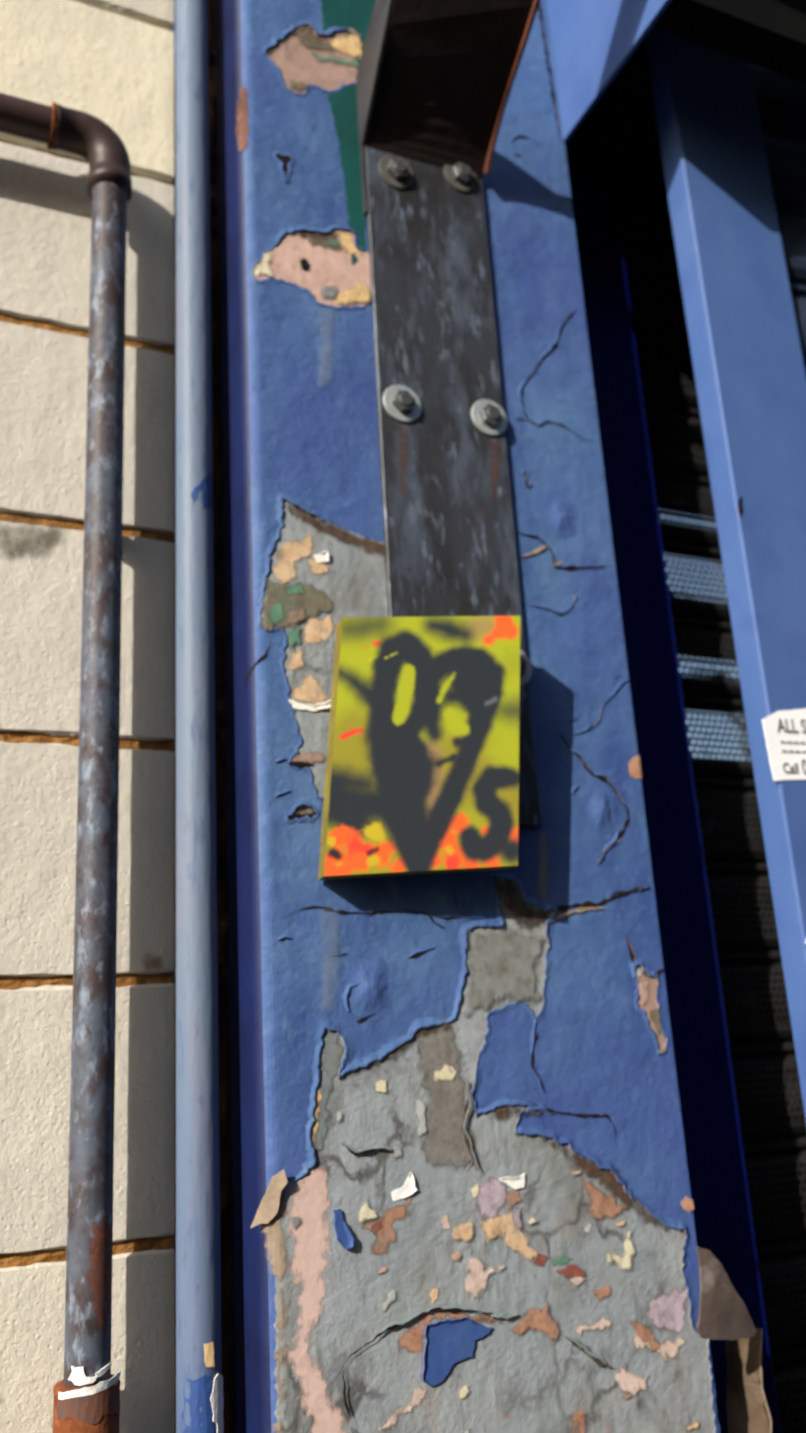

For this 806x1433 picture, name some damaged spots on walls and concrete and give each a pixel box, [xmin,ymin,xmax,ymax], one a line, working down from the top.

peeling [261,21,362,96]
peeling [249,225,372,311]
crack [513,304,593,442]
crack [522,467,533,488]
crack [518,530,612,616]
peeling [256,491,388,824]
crack [543,674,664,977]
peeling [251,873,772,1433]
corrosion [89,1218,111,1328]
crack [336,1304,527,1433]
crack [565,1336,613,1368]